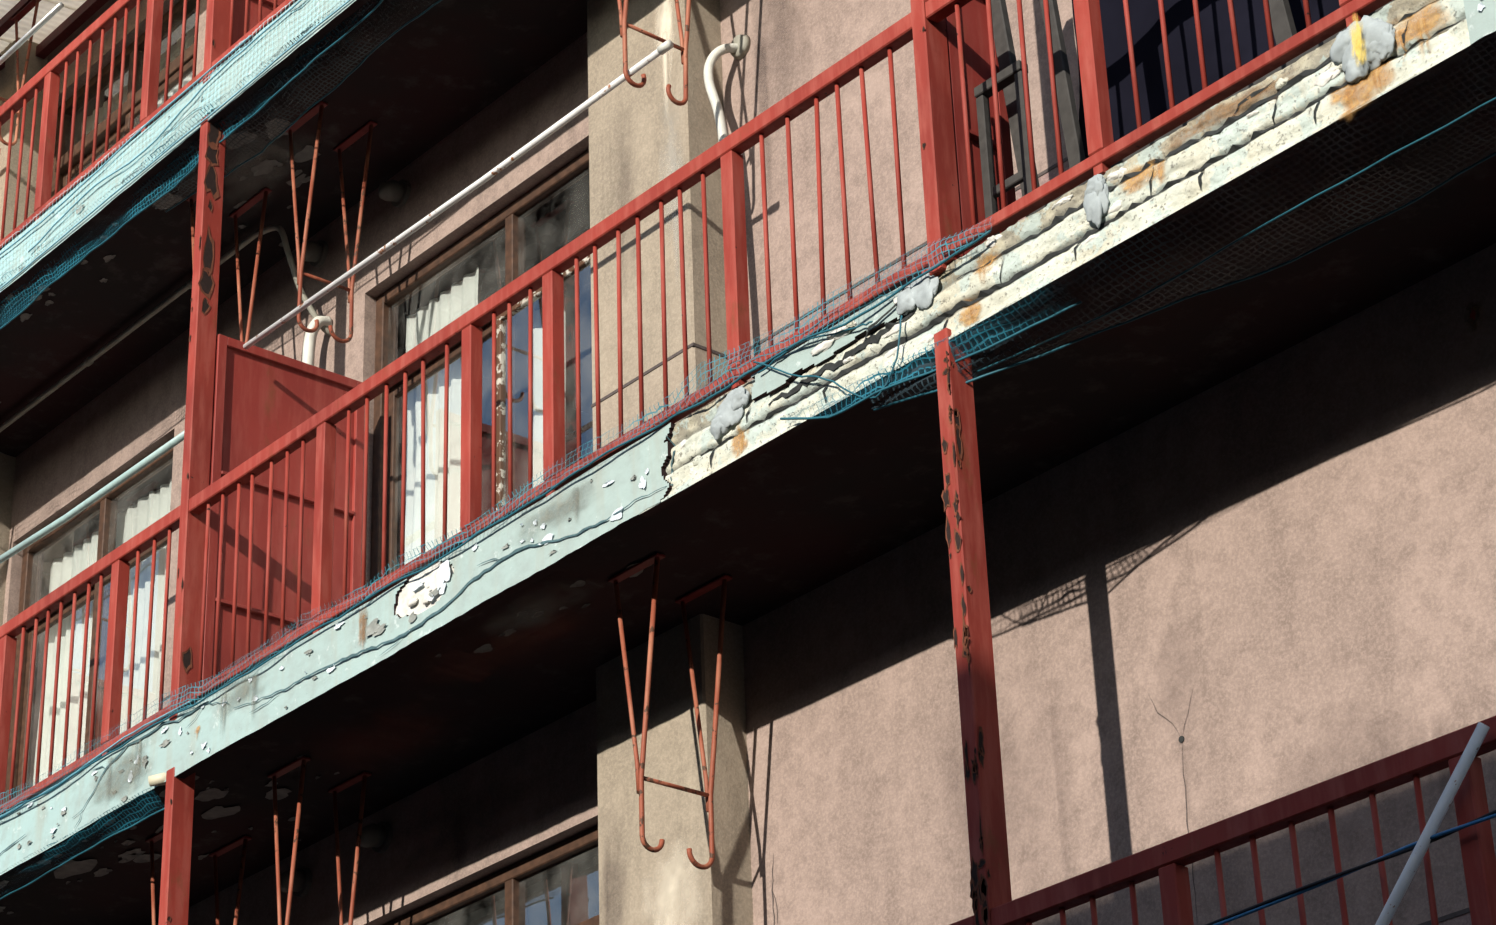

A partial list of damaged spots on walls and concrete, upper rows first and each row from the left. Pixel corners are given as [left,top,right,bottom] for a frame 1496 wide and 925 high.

rust [1332,5,1440,115]
crack [1380,0,1463,66]
spalling [590,0,1485,676]
crack [72,57,1348,828]
peeling [501,519,557,555]
spalling [365,559,454,651]
peeling [112,726,210,802]